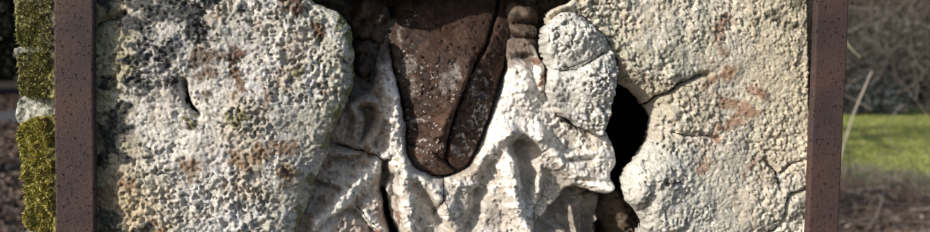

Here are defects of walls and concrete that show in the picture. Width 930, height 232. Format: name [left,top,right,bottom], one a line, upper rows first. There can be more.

crack [406,0,500,214]
crack [632,74,703,105]
crack [765,160,806,232]